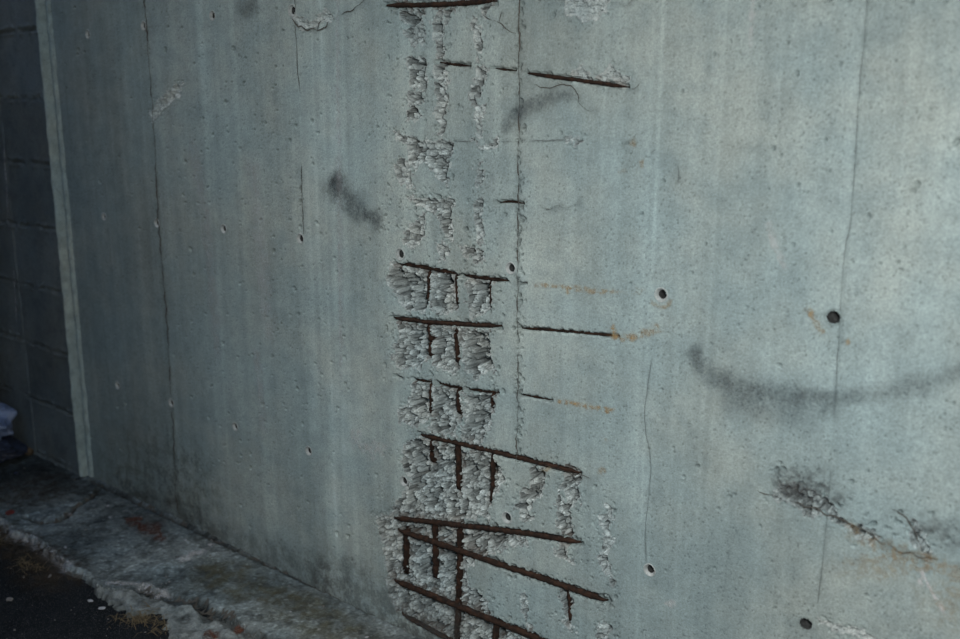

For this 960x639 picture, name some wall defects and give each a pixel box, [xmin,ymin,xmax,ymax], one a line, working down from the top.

corrosion [496,68,630,88]
spalling [570,63,631,89]
crack [486,0,588,458]
crack [29,0,375,616]
corrosion [394,316,503,363]
corrosion [399,263,509,307]
spalling [376,0,536,639]
corrosion [421,433,582,502]
spalling [512,465,547,523]
spalling [553,463,583,566]
spalling [772,481,881,547]
corrosion [394,516,609,639]